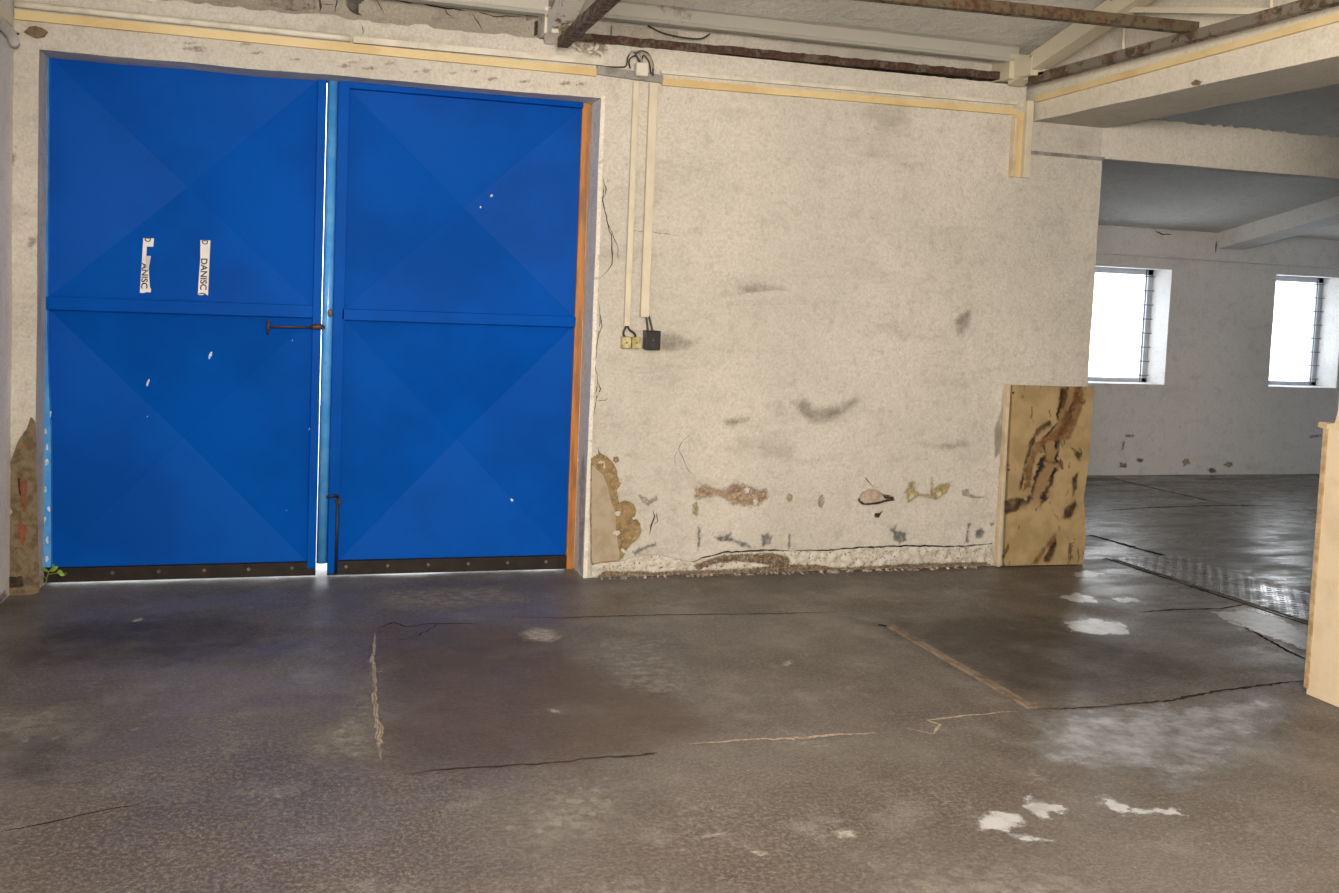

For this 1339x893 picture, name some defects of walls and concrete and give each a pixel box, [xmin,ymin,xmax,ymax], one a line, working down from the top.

spalling [590,453,994,580]
peeling [1304,409,1339,707]